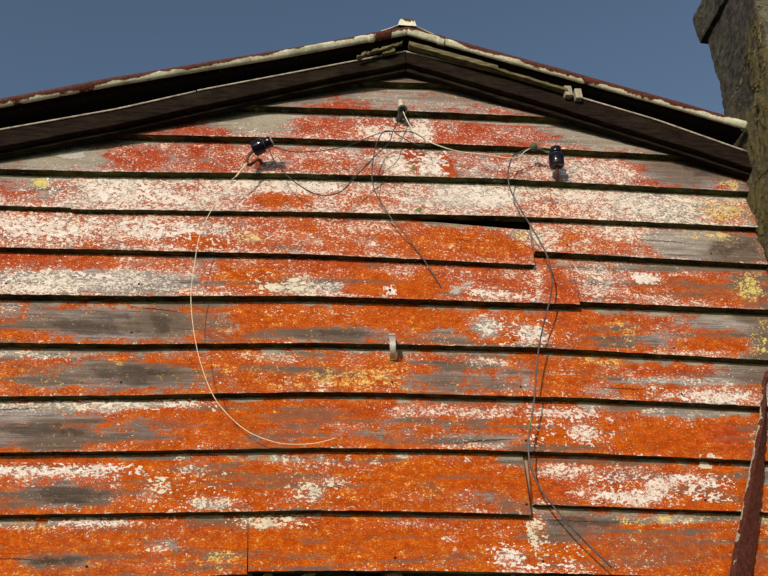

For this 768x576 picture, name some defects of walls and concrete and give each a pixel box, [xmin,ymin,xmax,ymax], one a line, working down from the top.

peeling [352,115,656,213]
peeling [0,176,359,252]
peeling [247,272,316,295]
peeling [630,272,661,285]
peeling [469,317,555,348]
peeling [0,395,217,411]
peeling [523,405,615,447]
peeling [643,386,768,405]
peeling [0,463,357,529]
peeling [587,453,737,507]
corrosion [729,370,768,576]
peeling [485,513,584,574]